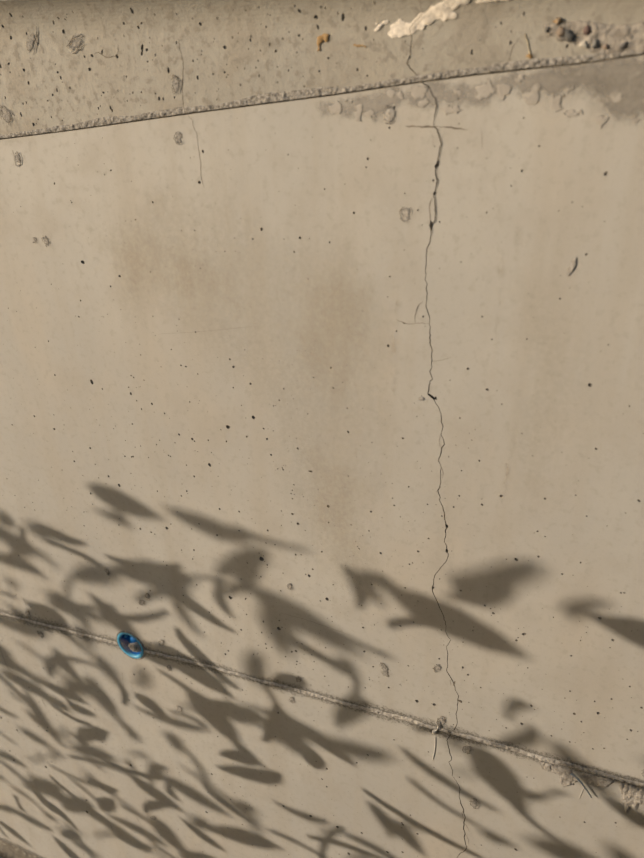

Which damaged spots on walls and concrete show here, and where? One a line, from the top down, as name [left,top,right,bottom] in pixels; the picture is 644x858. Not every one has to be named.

crack [396,3,469,856]
peeling [539,760,644,813]